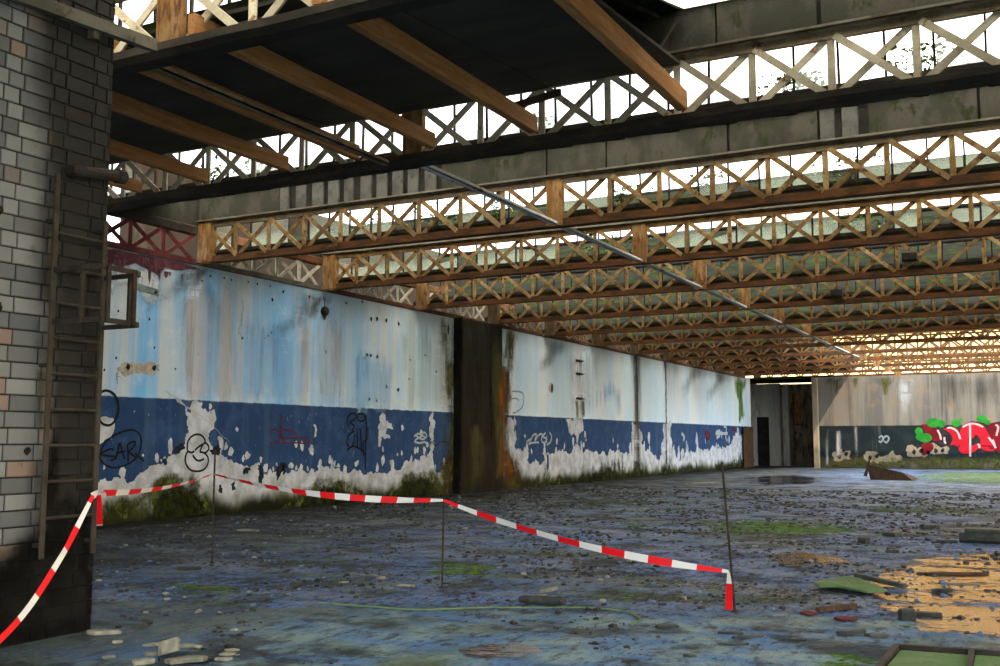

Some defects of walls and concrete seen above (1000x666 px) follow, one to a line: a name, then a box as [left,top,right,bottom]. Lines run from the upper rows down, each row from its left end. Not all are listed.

damp [108,260,183,302]
flaking render [115,357,160,377]
peeling [98,400,453,523]
rust [494,351,520,486]
peeling [502,415,744,488]